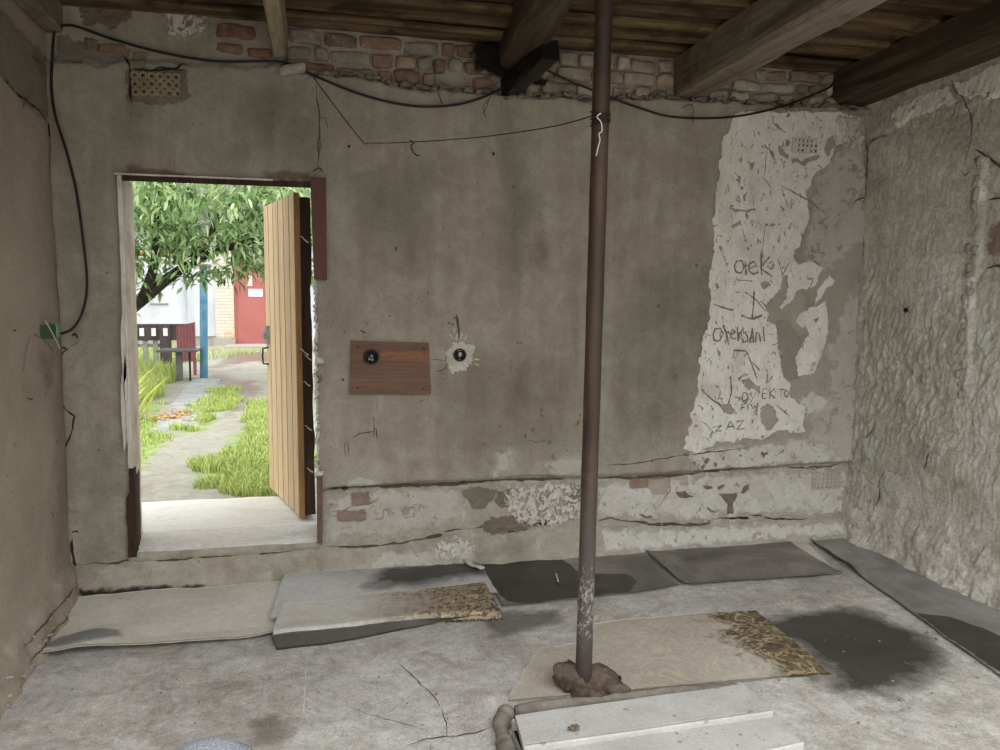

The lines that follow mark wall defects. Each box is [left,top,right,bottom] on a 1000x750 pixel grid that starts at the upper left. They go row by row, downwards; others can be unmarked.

flaking render [287,28,594,102]
flaking render [610,56,677,101]
peeling [891,61,1000,128]
crack [951,84,973,176]
peeling [683,69,880,469]
flaking render [330,493,415,522]
peeling [433,480,581,562]
flaking render [629,477,693,508]
crack [600,447,839,480]
spalling [703,484,749,514]
leakage [772,609,938,690]
crack [351,663,488,746]